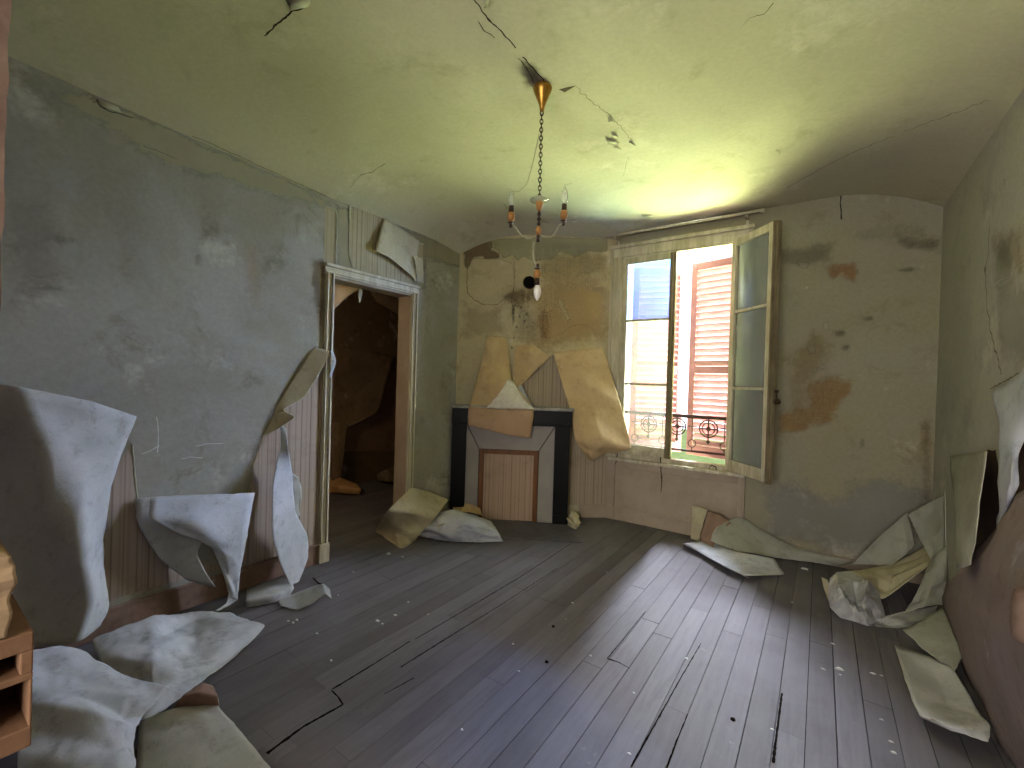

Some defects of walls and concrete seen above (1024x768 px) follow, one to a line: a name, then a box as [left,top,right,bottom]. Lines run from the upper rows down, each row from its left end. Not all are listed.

crack [264,0,311,36]
crack [474,0,545,83]
crack [576,86,636,172]
peeling [348,205,412,284]
peeling [492,237,607,260]
crack [985,227,1020,389]
peeling [521,355,569,407]
peeling [103,444,184,602]
peeling [242,372,322,564]
peeling [974,448,999,550]